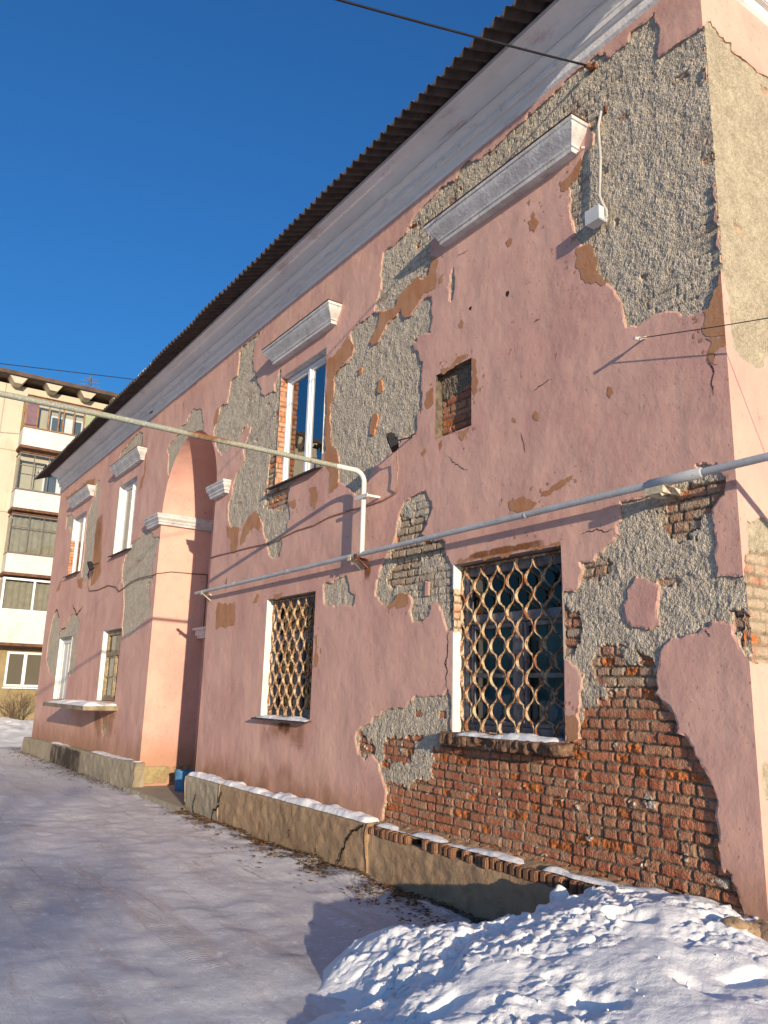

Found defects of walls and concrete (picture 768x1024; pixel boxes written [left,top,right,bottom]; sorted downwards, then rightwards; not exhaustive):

flaking render [167,14,768,559]
flaking render [46,610,80,678]
flaking render [121,530,160,639]
flaking render [323,576,355,607]
flaking render [355,464,768,921]
crack [315,825,363,864]